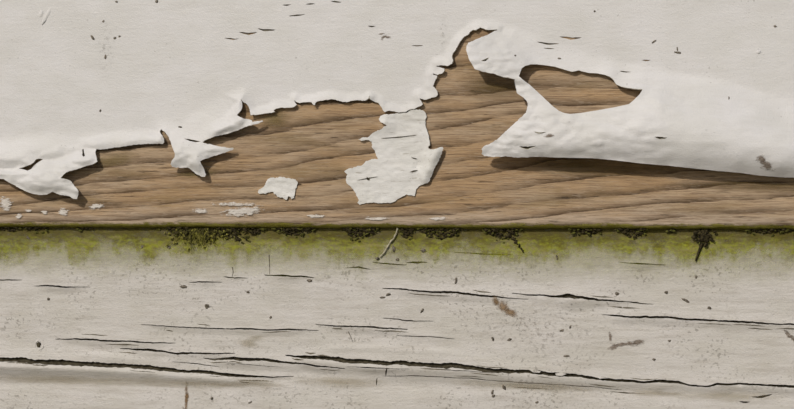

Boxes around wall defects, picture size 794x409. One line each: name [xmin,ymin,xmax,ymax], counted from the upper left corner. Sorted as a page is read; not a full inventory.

peeling [0,20,794,205]
crack [383,288,794,330]
crack [0,318,794,403]